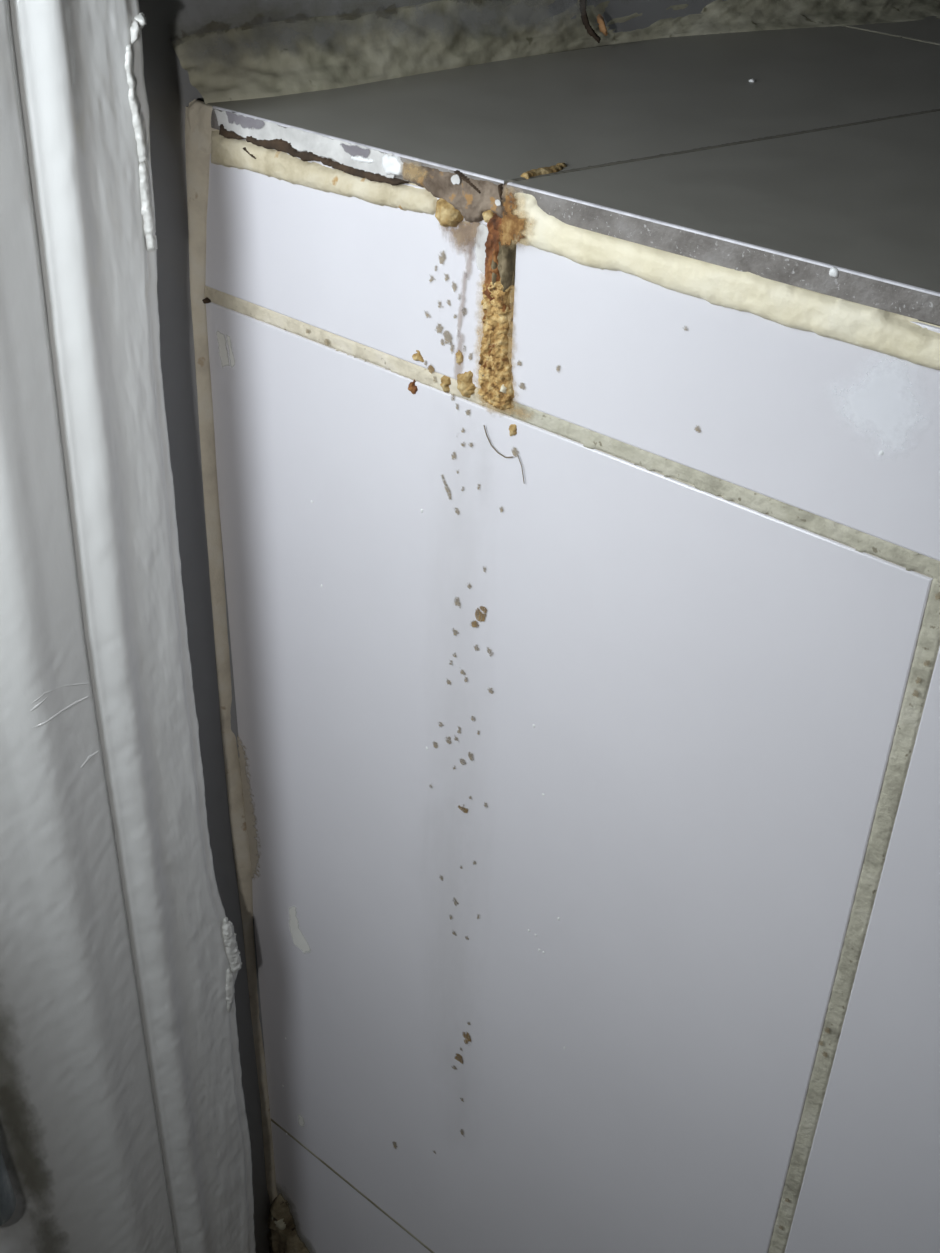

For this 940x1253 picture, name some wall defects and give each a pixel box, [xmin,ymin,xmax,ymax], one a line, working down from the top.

corrosion [435,192,526,436]